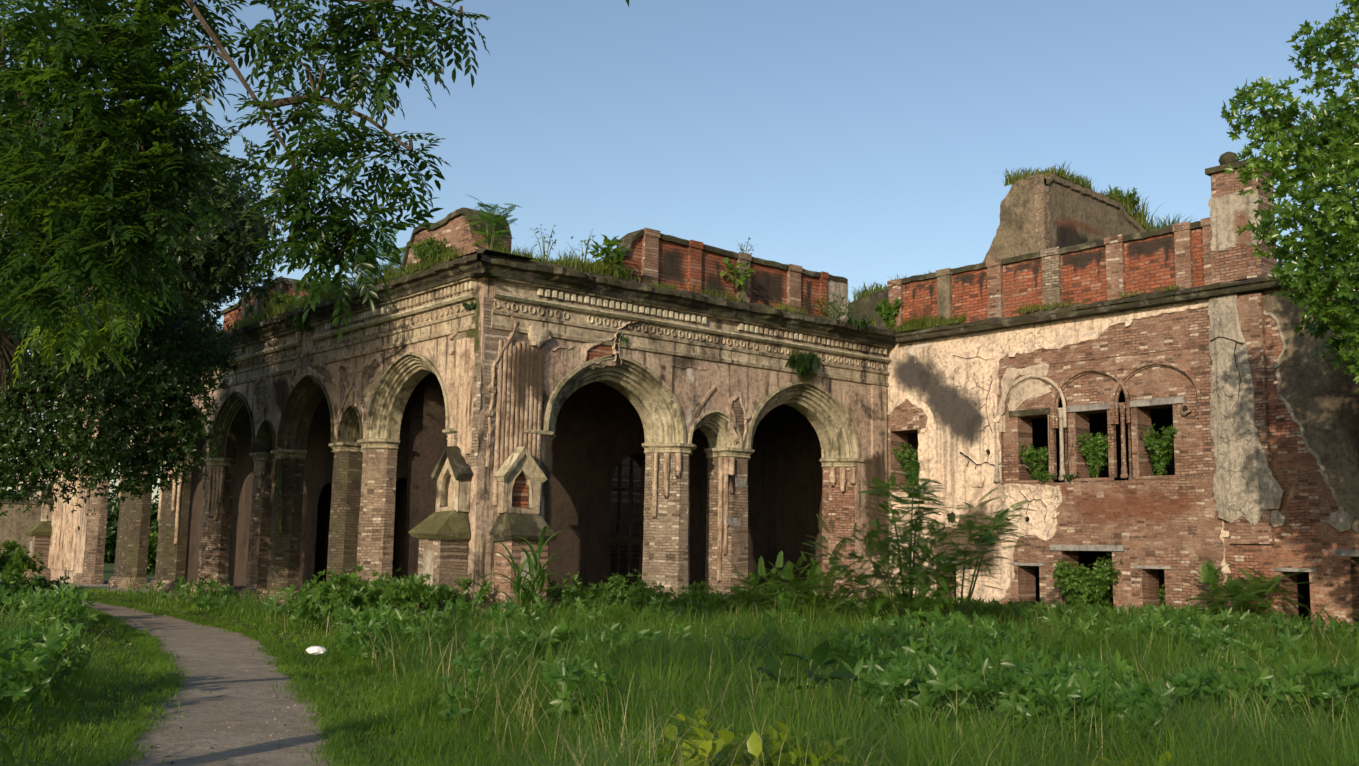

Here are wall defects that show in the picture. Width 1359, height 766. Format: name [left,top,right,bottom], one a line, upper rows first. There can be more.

leakage [506,345,552,528]
leakage [895,342,983,441]
flaking render [958,299,1359,632]